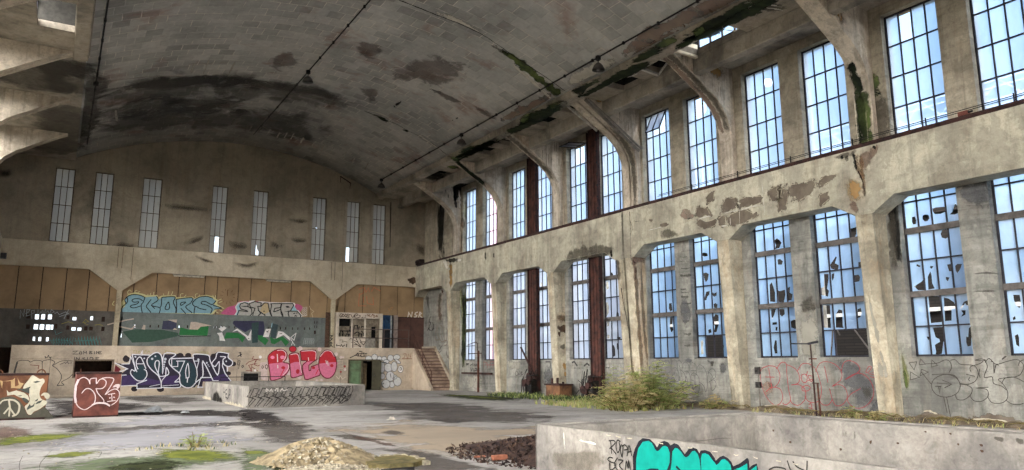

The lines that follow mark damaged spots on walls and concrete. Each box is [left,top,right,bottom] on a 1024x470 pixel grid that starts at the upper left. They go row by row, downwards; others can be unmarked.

peeling [568,0,735,85]
damp [34,60,368,169]
spalling [681,174,836,229]